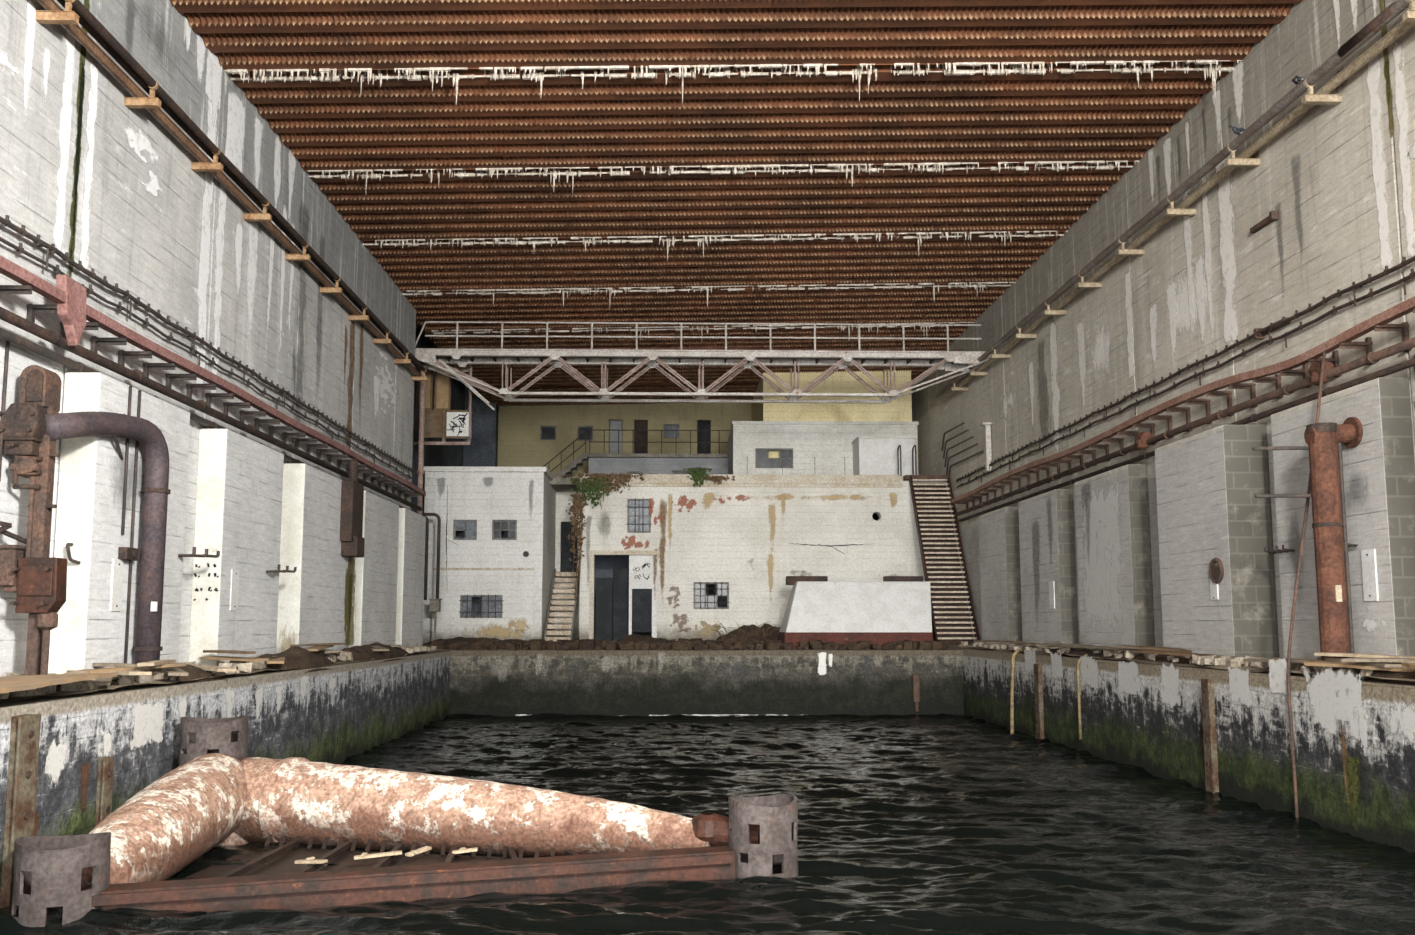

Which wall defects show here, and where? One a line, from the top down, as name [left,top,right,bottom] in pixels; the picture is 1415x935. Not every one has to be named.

damp [1333,0,1377,49]
damp [1366,41,1415,269]
damp [817,652,833,675]
peeling [1080,656,1099,691]
peeling [1117,661,1140,696]
peeling [1160,663,1181,708]
peeling [1228,666,1253,707]
peeling [1268,658,1287,695]
peeling [1304,668,1368,754]
peeling [1389,702,1415,743]